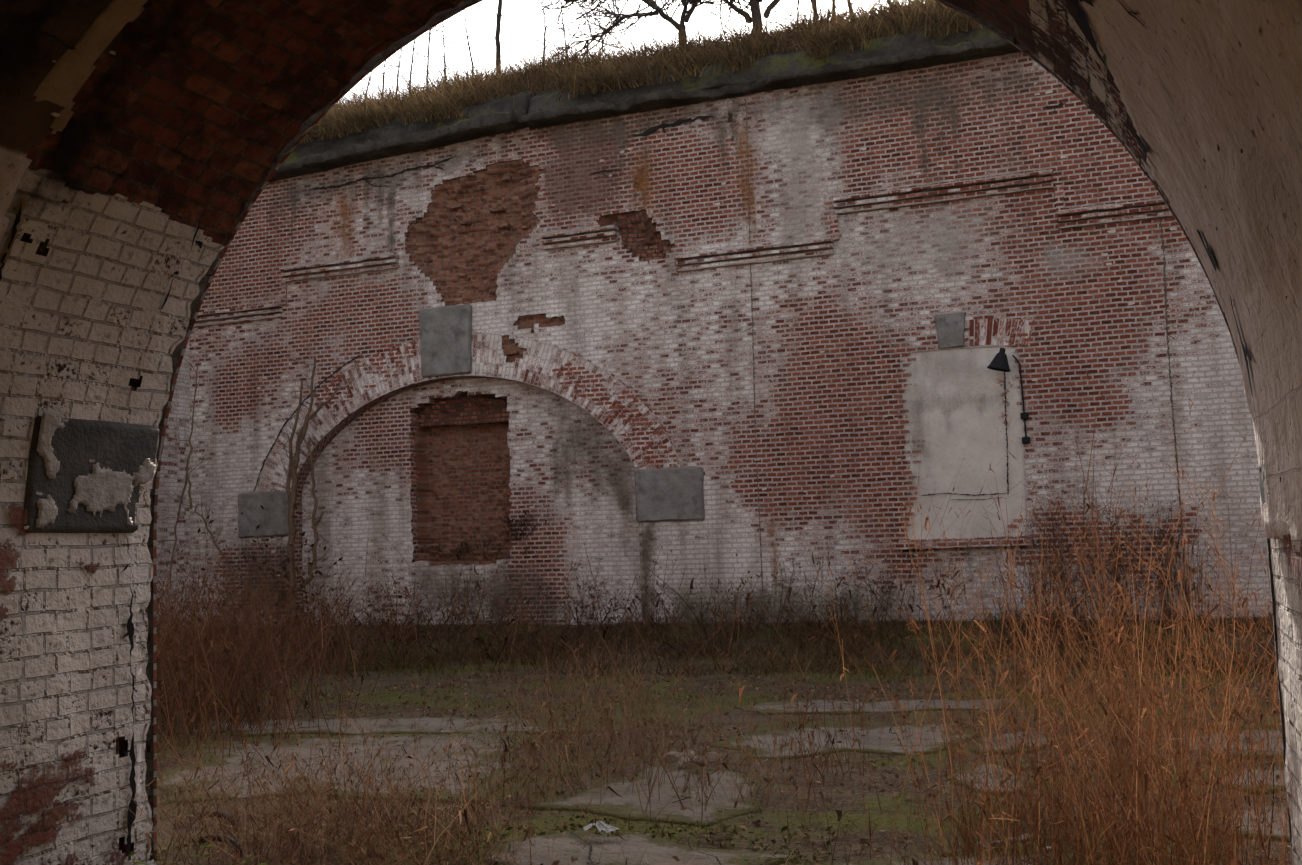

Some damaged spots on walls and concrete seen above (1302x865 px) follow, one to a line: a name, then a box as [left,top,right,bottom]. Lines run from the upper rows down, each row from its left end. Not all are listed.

crack [632,116,714,137]
peeling [0,194,50,273]
spalling [203,111,762,483]
peeling [37,410,69,479]
spalling [128,375,143,391]
crack [745,100,765,623]
peeling [726,290,932,587]
peeling [0,458,157,622]
spalling [116,736,128,758]
crack [121,536,137,864]
peeling [0,748,95,865]
spalling [102,836,142,865]